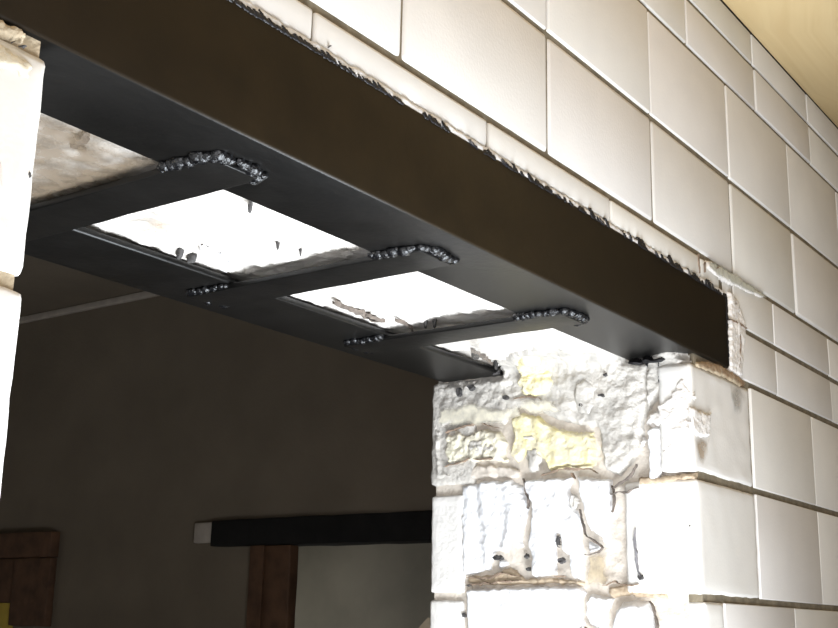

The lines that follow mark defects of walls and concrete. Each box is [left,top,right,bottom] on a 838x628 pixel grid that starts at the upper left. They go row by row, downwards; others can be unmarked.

spalling [516,356,553,397]
crack [522,464,639,513]
spalling [445,413,655,628]
crack [579,509,604,555]